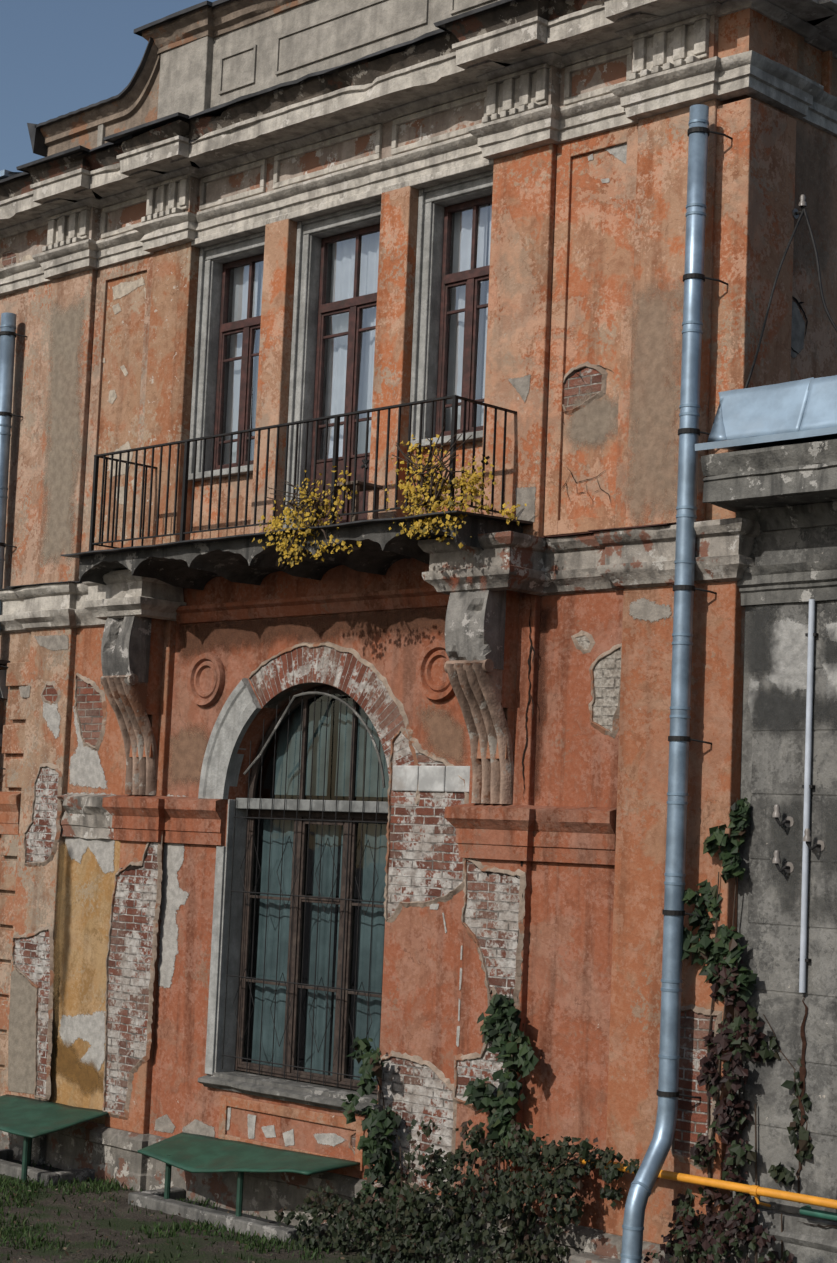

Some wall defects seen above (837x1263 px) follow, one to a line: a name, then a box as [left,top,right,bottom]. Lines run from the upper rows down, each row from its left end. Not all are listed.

spalling [562,361,608,415]
peeling [34,635,68,651]
spalling [571,630,622,738]
damp [744,604,837,734]
spalling [12,673,189,1120]
spalling [247,641,526,1193]
spalling [670,1004,723,1170]